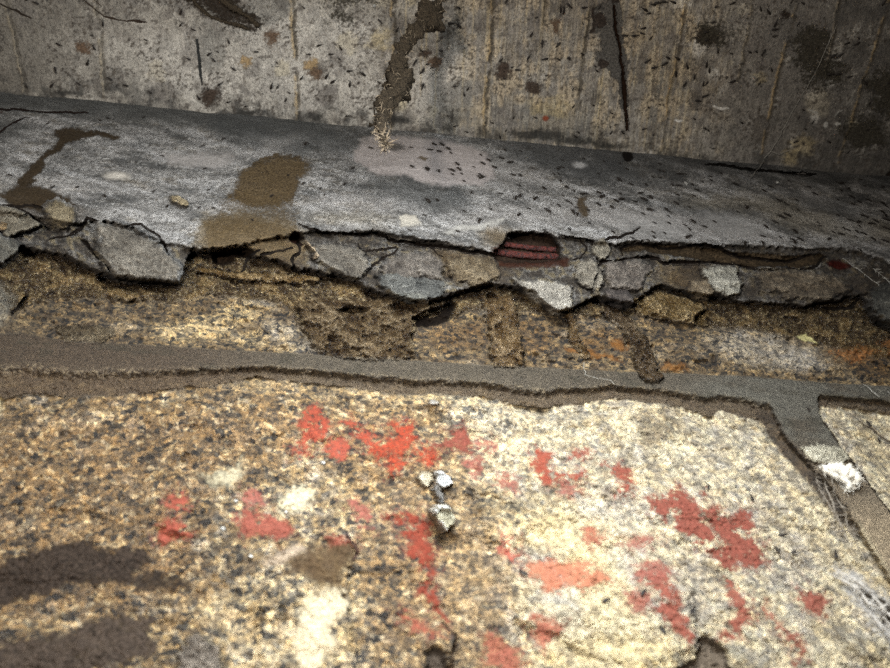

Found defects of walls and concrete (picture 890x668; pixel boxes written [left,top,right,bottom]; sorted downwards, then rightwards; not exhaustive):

crack [84,0,147,23]
crack [612,5,629,131]
crack [0,108,88,133]
damp [838,66,890,150]
damp [0,127,120,211]
damp [167,154,229,167]
damp [229,153,311,207]
spalling [493,232,560,263]